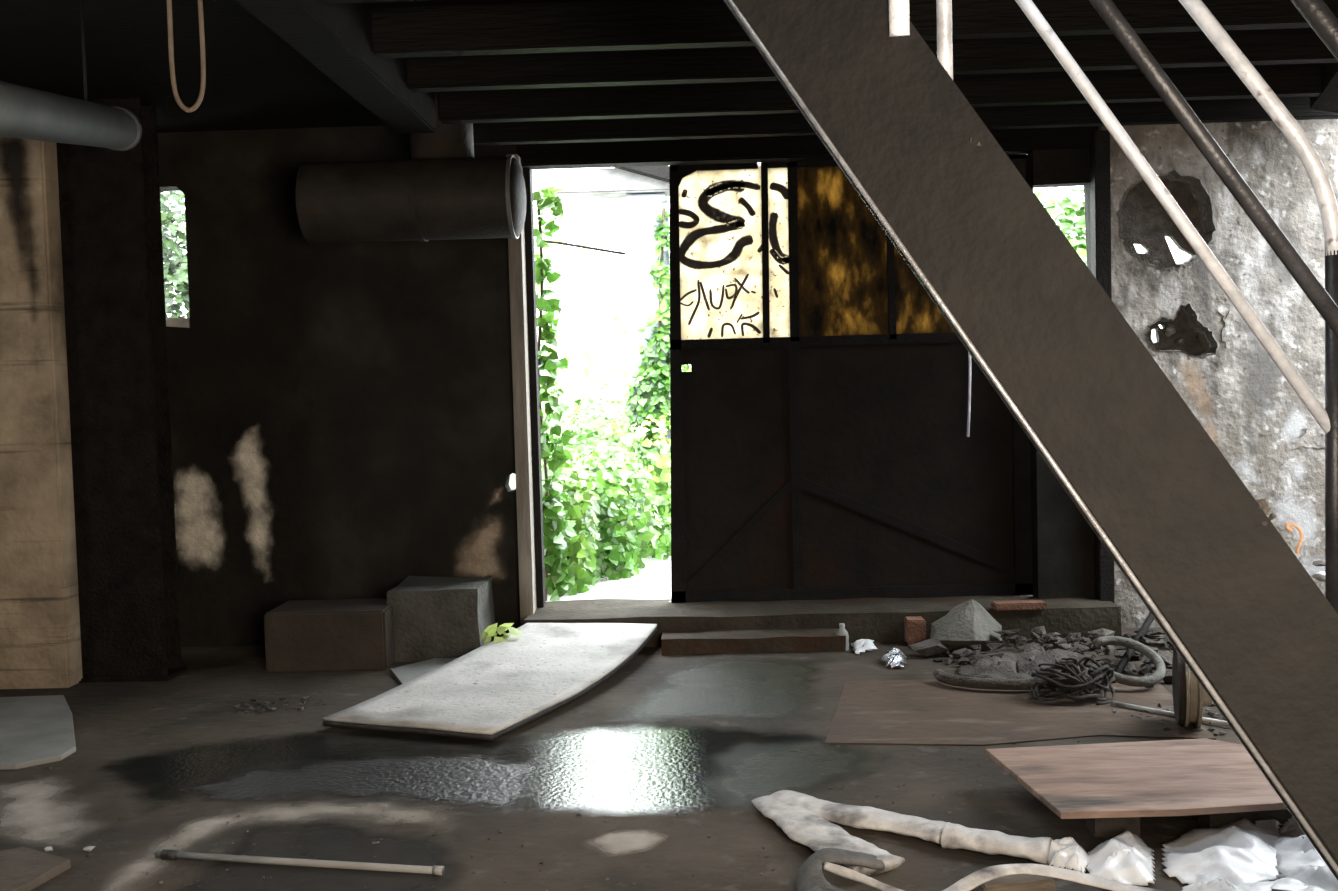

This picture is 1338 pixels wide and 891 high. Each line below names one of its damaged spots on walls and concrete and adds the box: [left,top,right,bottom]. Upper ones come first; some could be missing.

spalling [1116,167,1217,273]
spalling [1145,301,1220,359]